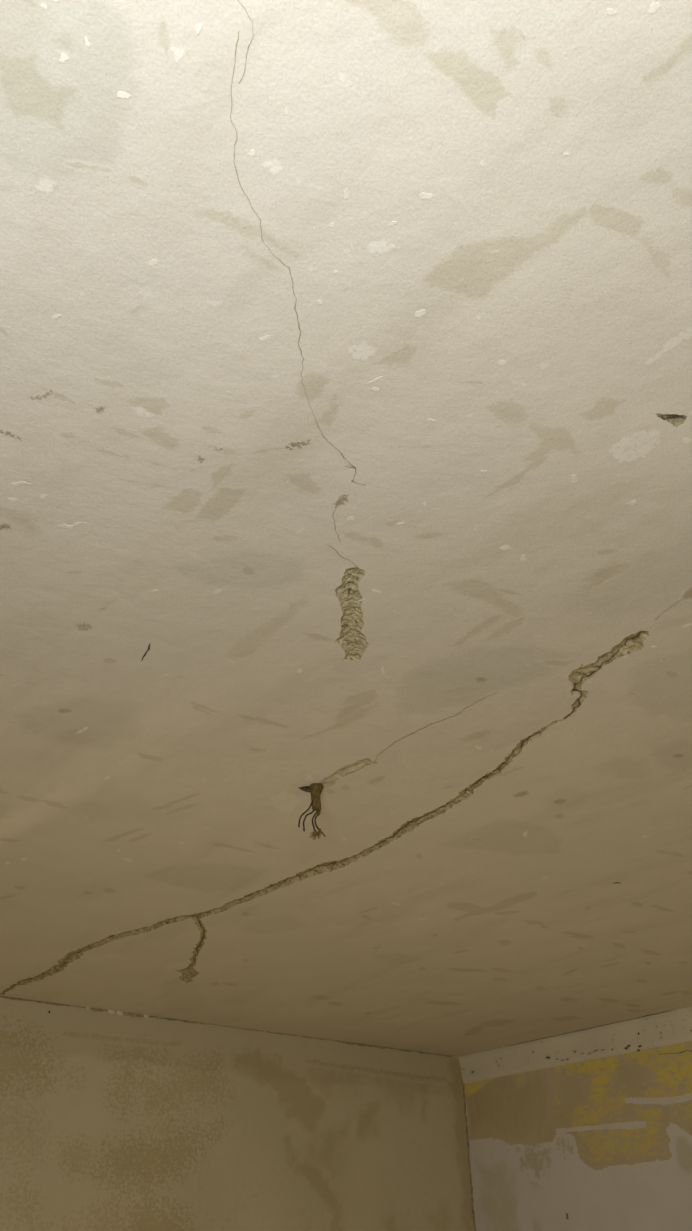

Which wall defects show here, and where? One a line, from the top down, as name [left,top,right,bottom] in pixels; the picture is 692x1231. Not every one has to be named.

crack [230,0,366,567]
spalling [335,567,369,661]
crack [0,599,683,1231]
leakage [0,1038,386,1231]
leakage [380,1019,665,1231]
peeling [554,1041,692,1170]